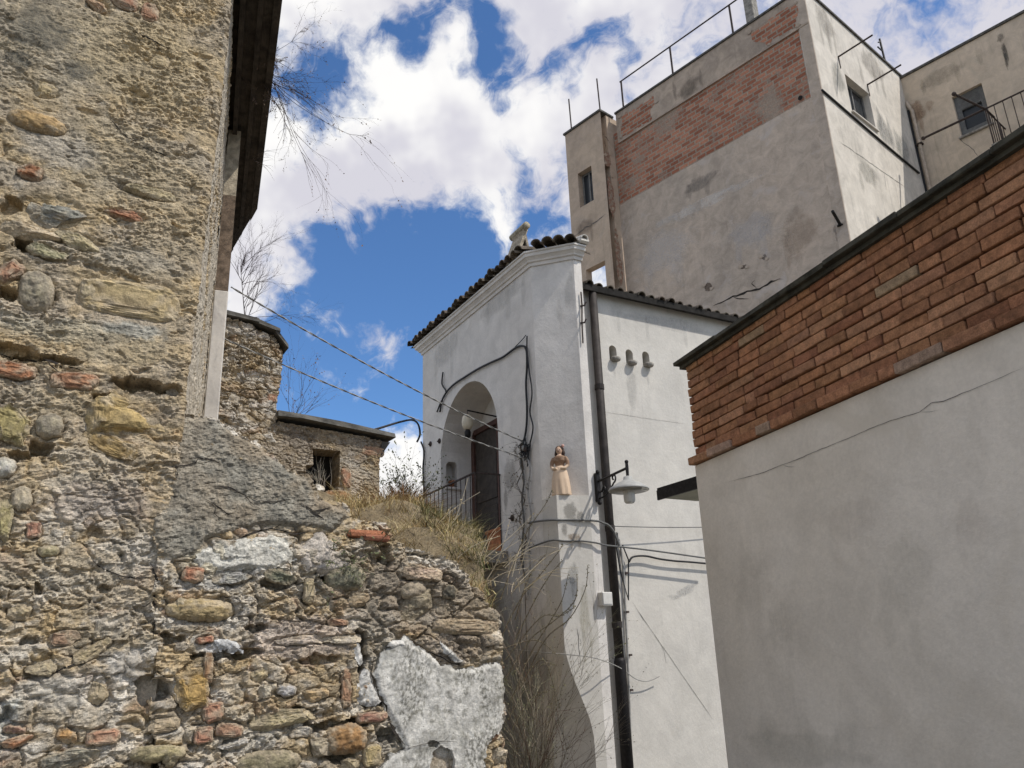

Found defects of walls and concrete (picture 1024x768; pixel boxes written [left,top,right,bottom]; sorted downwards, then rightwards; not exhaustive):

crack [713,279,778,306]
crack [730,367,1024,482]